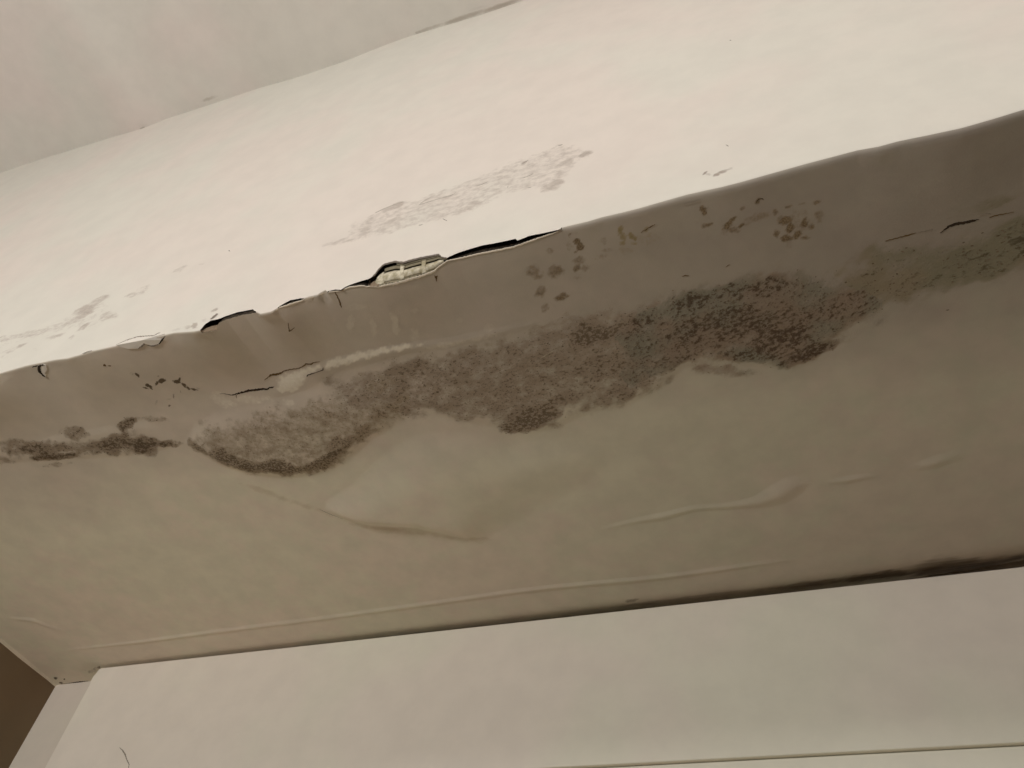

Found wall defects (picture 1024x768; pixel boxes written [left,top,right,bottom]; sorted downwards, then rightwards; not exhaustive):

crack [886,212,1012,241]
spalling [368,254,449,288]
damp [0,192,1024,479]
crack [227,362,323,398]